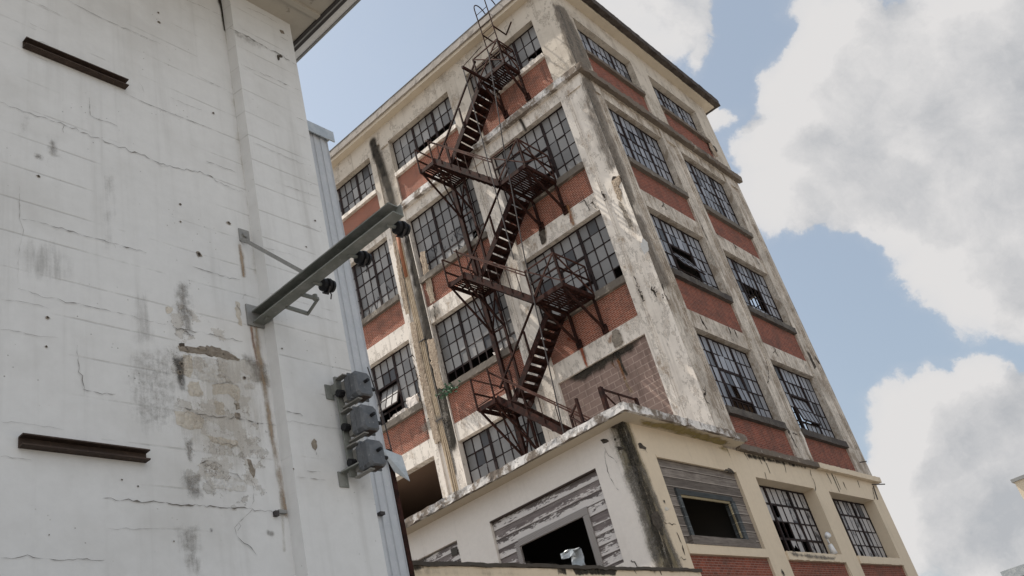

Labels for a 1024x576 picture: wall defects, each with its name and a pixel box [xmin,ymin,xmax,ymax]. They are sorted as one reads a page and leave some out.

spalling [609,329,623,348]
peeling [177,343,246,420]
rust [251,327,276,452]
crack [108,480,270,554]
peeling [201,459,256,492]
damp [611,421,682,575]